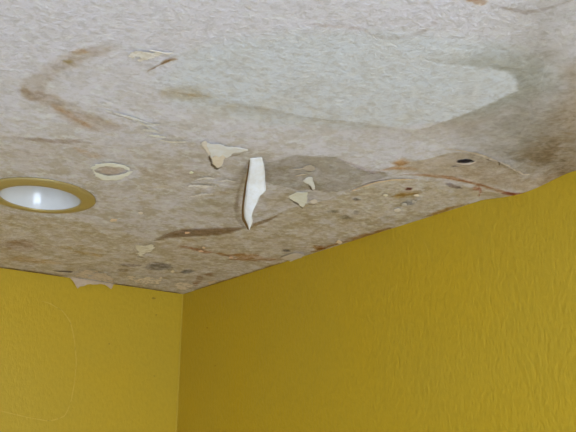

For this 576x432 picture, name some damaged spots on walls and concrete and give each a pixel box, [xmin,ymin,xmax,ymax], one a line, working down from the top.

peeling [201,141,248,170]
peeling [242,157,266,230]
peeling [289,165,318,207]
peeling [59,270,115,289]